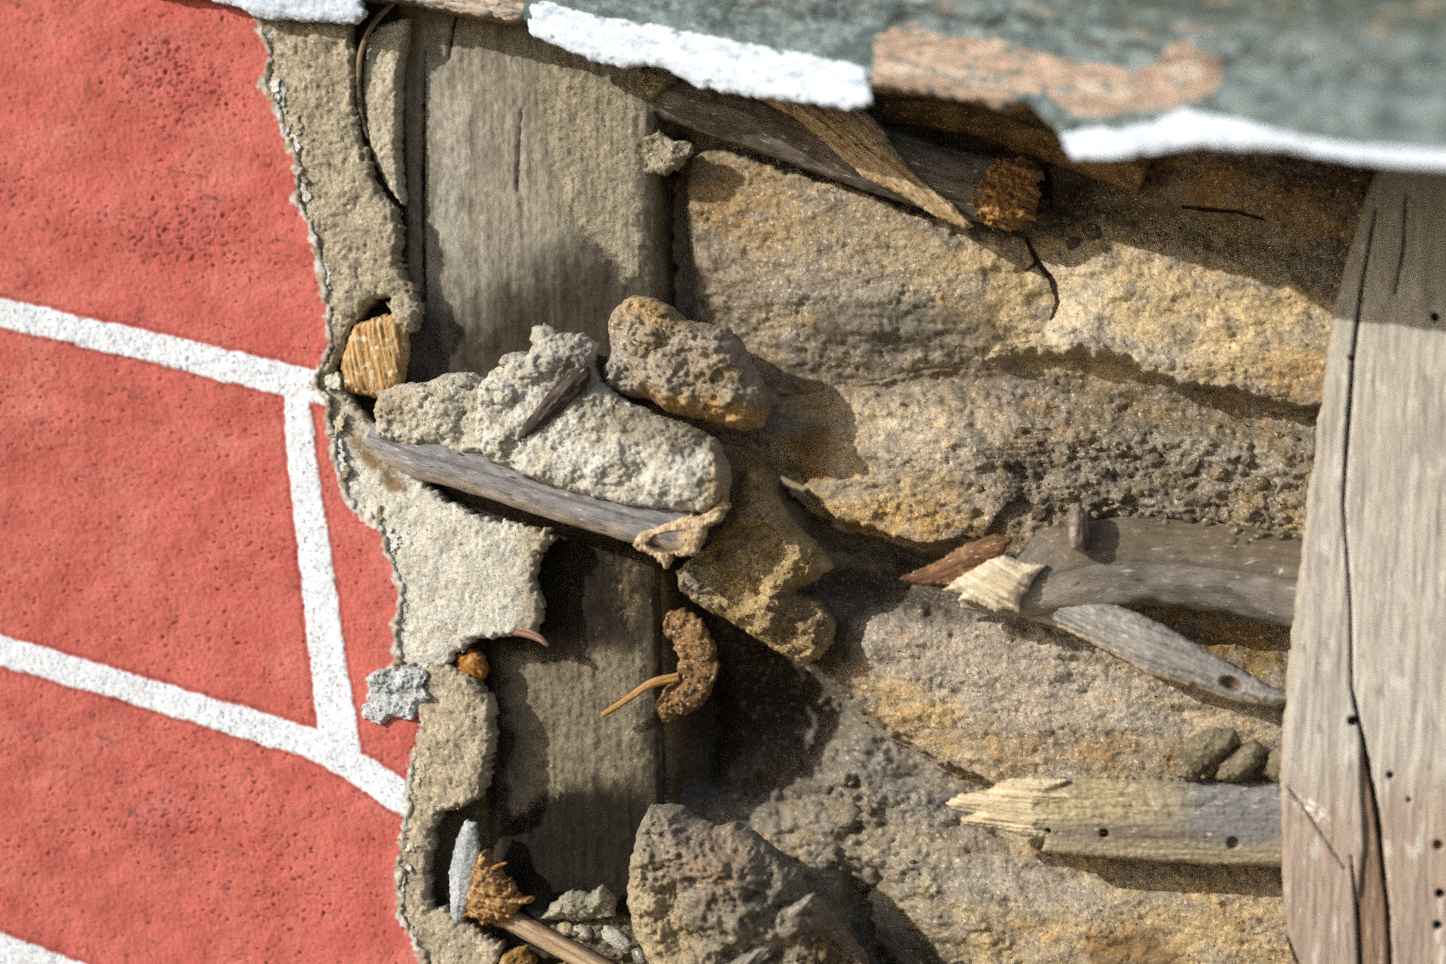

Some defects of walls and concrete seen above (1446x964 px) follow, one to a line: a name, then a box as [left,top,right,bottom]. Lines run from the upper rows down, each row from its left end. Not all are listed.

peeling [385,0,524,23]
peeling [869,22,1222,117]
crack [1181,205,1265,221]
crack [1024,238,1059,320]
spalling [262,19,558,964]
crack [1288,195,1407,964]
crack [1286,935,1299,964]